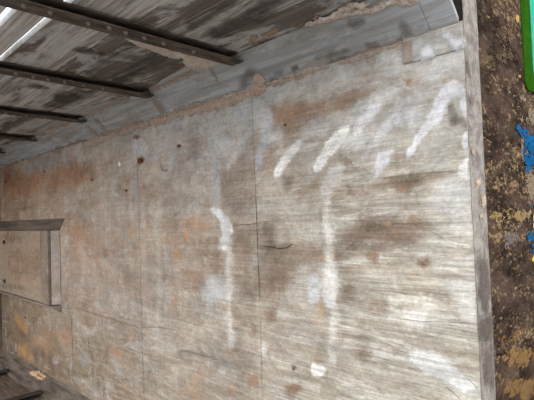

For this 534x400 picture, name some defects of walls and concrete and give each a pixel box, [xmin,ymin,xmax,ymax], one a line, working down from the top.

spalling [125,38,220,72]
damp [209,0,283,39]
spalling [82,65,328,149]
damp [105,32,493,400]